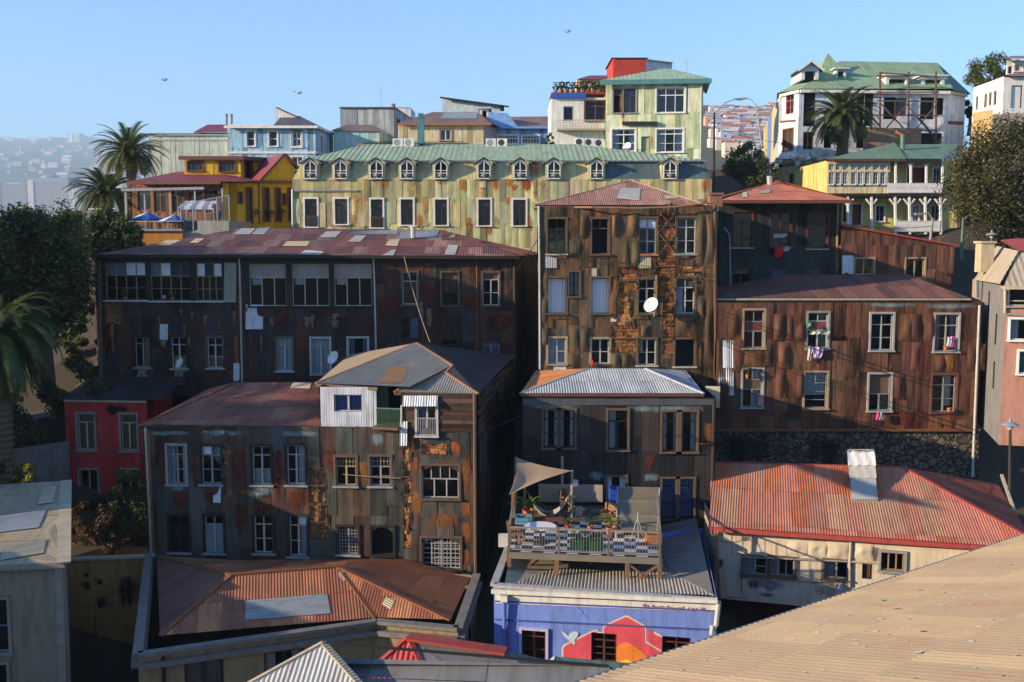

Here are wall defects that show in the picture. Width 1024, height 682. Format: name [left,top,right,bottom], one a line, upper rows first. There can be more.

rust [480,162,544,229]
rust [158,452,213,511]
rust [450,442,470,487]
rust [433,502,470,569]